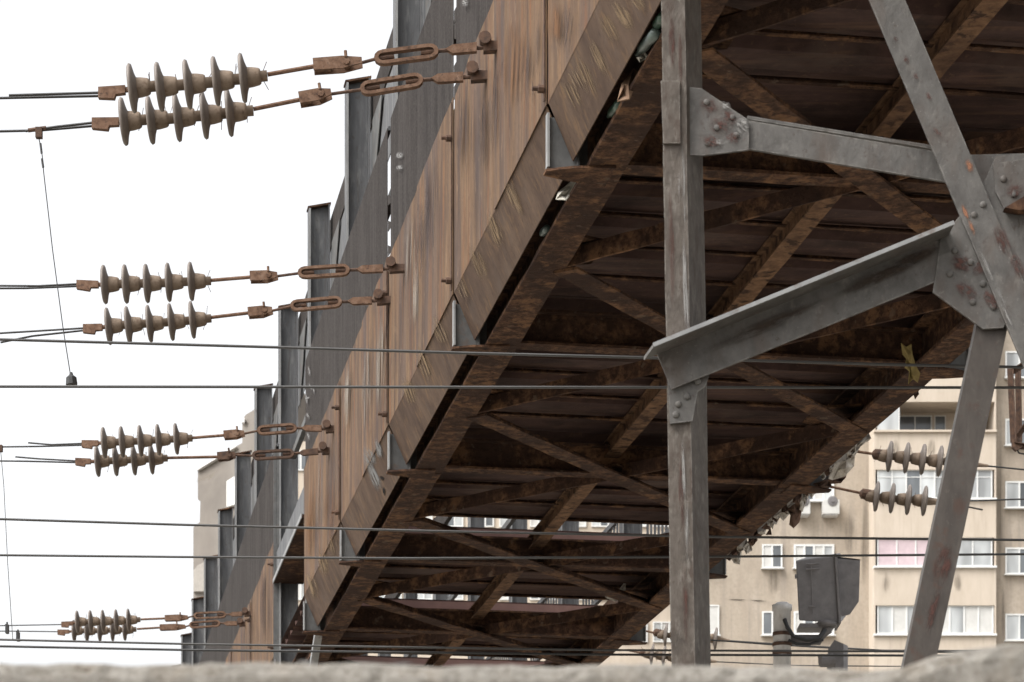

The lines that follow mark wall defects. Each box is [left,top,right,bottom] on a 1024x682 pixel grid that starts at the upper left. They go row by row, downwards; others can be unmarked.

peeling [725,434,871,565]